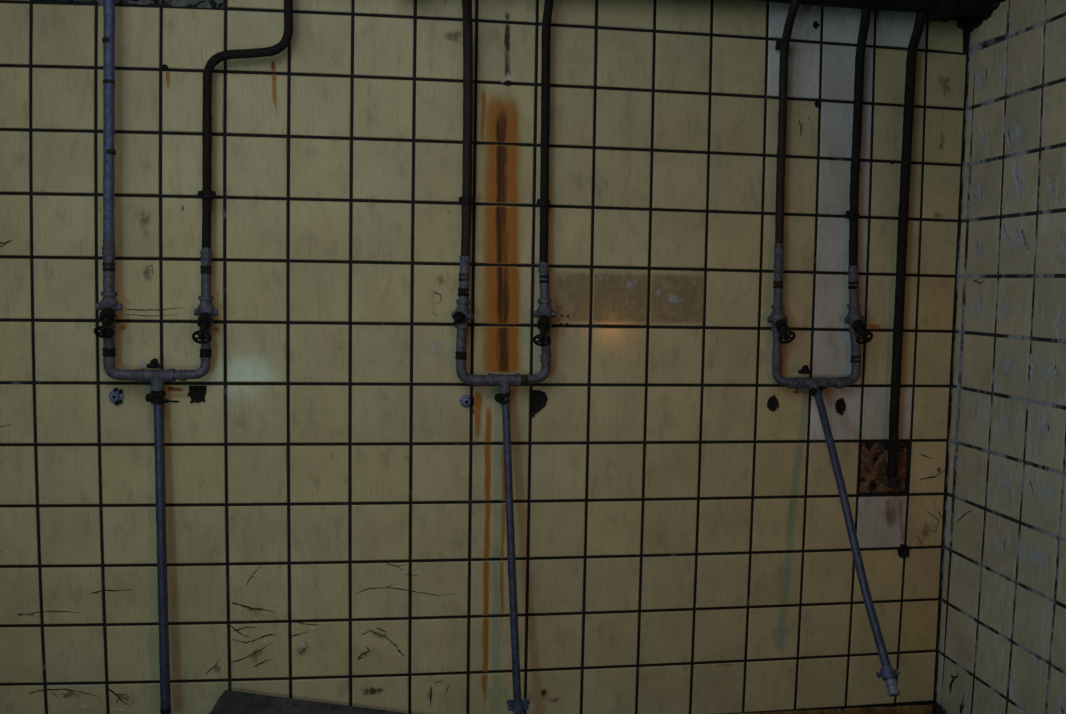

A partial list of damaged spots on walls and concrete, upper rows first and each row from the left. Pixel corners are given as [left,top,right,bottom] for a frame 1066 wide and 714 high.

rust [481,92,518,372]
rust [474,394,505,693]